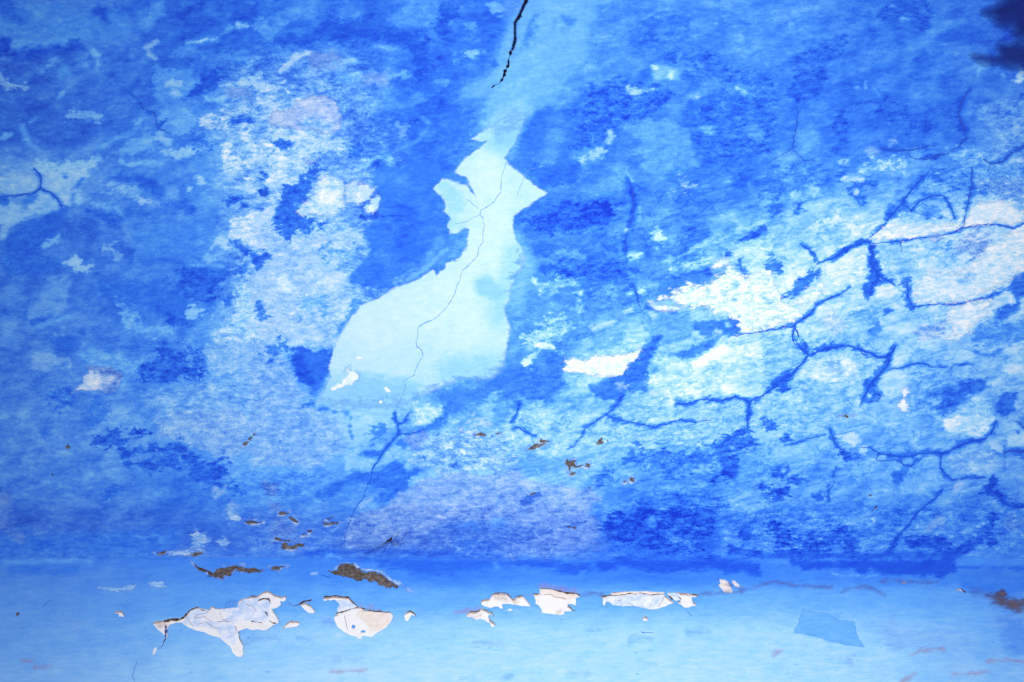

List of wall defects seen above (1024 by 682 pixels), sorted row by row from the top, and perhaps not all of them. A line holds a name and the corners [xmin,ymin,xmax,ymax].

crack [491,0,528,88]
water stain [985,0,1024,67]
crack [0,168,63,207]
crack [570,88,1024,448]
crack [339,150,539,549]
crack [791,420,1024,551]
flaking render [152,547,289,581]
flaking render [153,591,416,657]
flaking render [328,562,414,592]
flaking render [467,588,580,627]
flaking render [602,591,698,621]